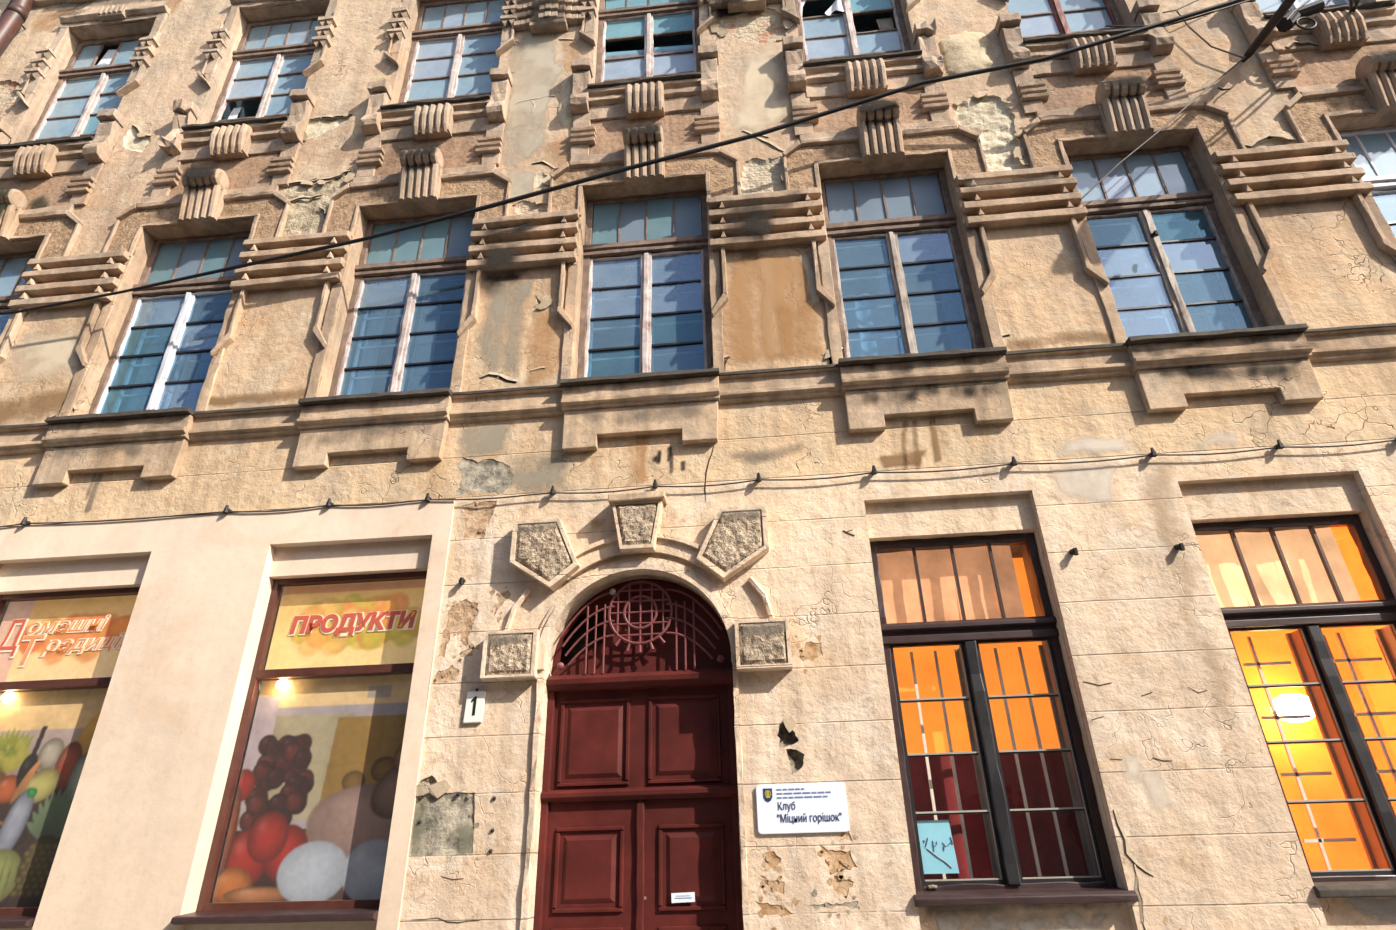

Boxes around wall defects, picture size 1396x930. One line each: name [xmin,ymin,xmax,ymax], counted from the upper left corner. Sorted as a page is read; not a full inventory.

flaking render [953,91,1029,172]
flaking render [282,171,356,235]
peeling [451,458,514,539]
spalling [777,716,805,774]
peeling [408,775,495,861]
peeling [756,831,860,930]